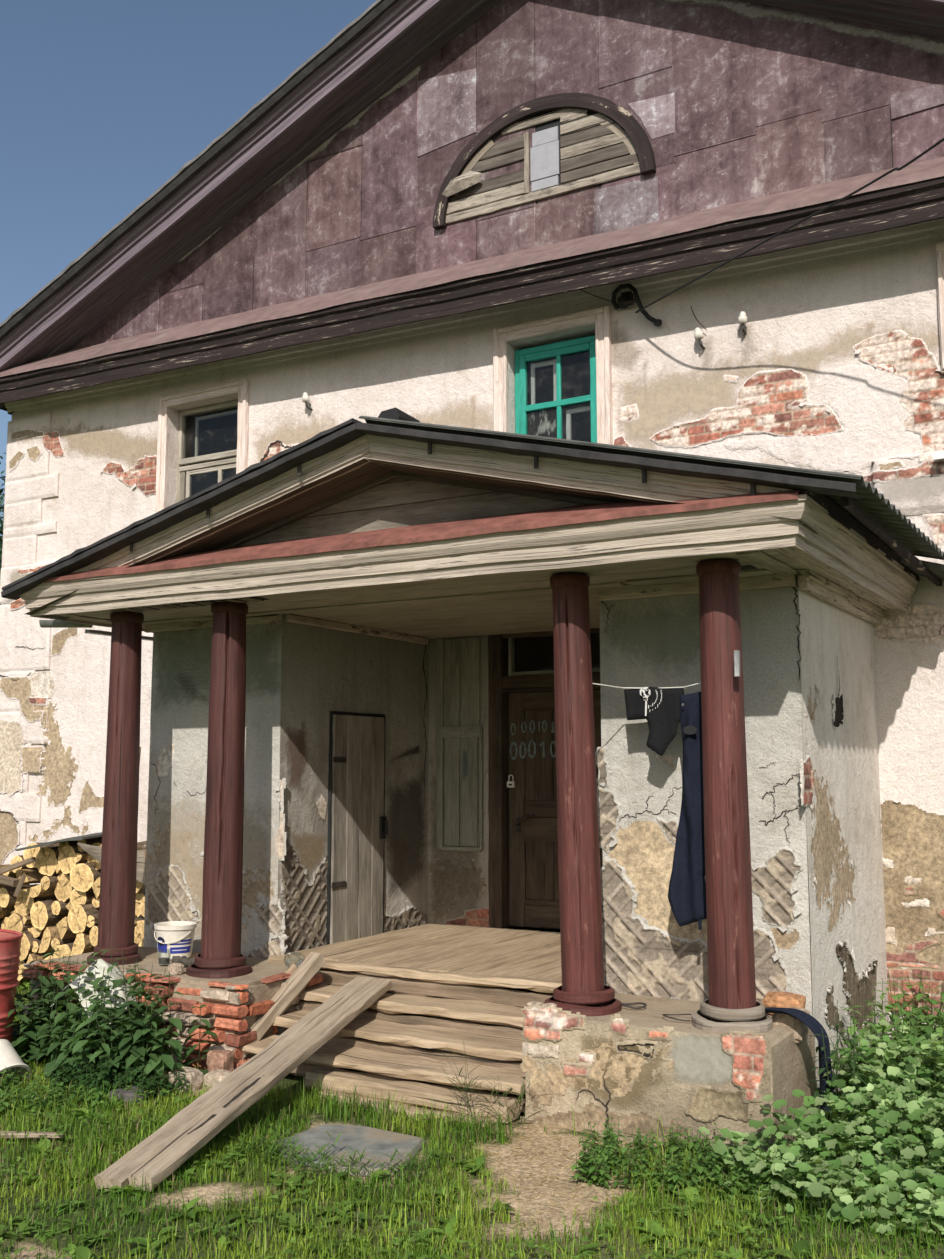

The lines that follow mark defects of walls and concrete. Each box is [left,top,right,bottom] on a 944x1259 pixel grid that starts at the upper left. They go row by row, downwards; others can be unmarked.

flaking render [100,455,157,498]
flaking render [262,441,300,461]
flaking render [649,367,844,449]
flaking render [852,329,944,485]
flaking render [0,628,104,865]
crack [620,787,681,819]
flaking render [606,819,707,947]
crack [759,762,800,844]
flaking render [769,755,856,962]
flaking render [880,797,944,1022]
crack [576,1070,611,1128]
flaking render [520,987,810,1139]